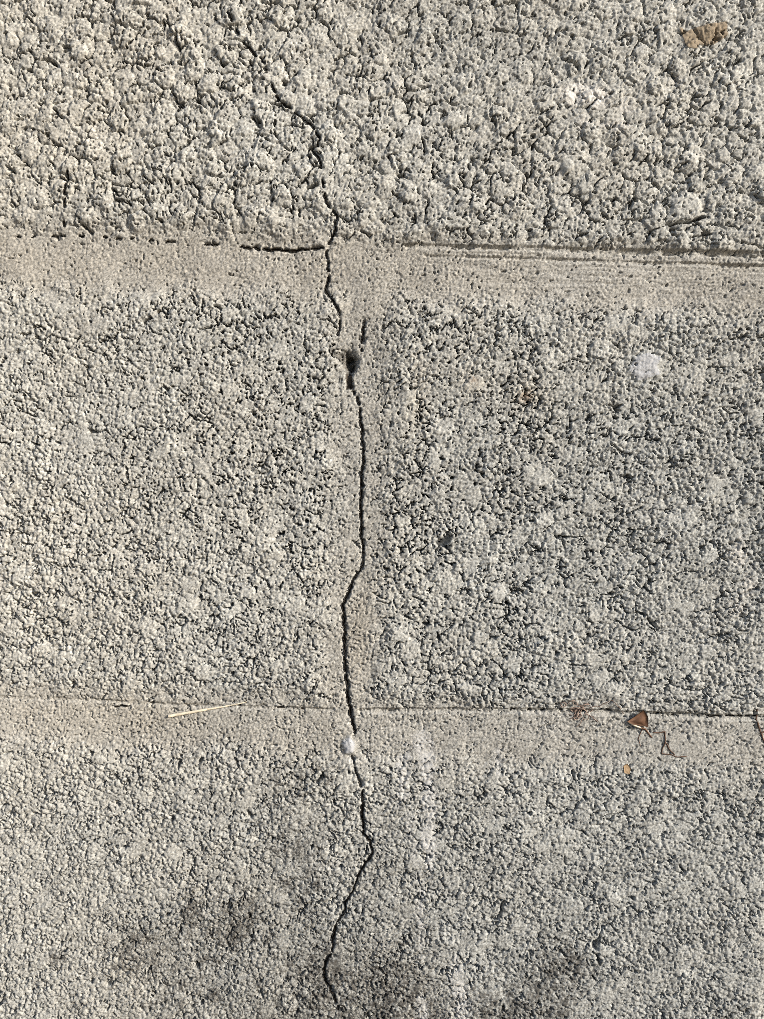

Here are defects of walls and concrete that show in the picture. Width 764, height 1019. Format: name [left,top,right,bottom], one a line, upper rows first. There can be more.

crack [204,11,365,355]
crack [323,385,373,1017]